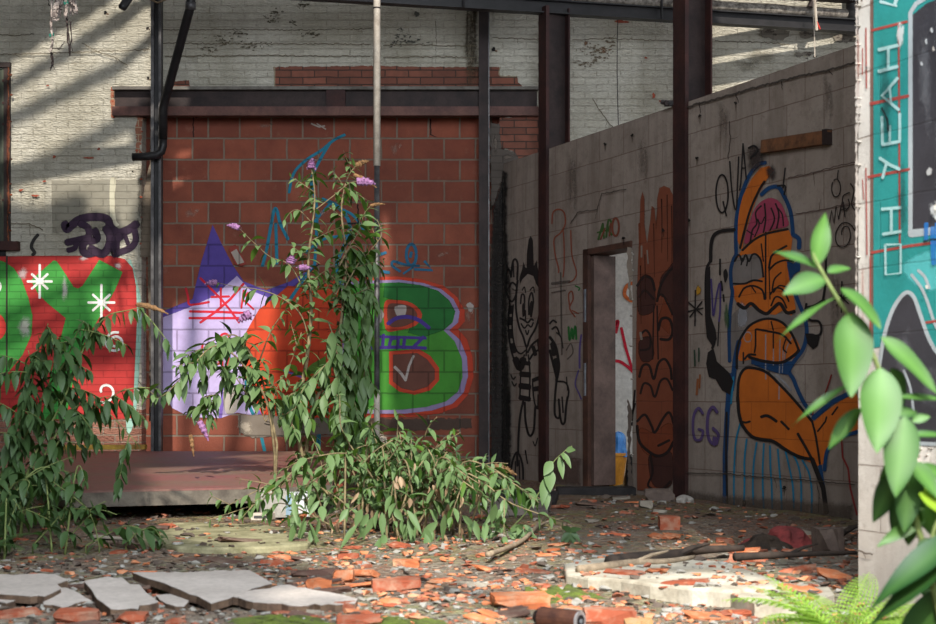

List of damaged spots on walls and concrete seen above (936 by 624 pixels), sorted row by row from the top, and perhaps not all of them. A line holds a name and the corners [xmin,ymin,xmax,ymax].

peeling [573,37,615,67]